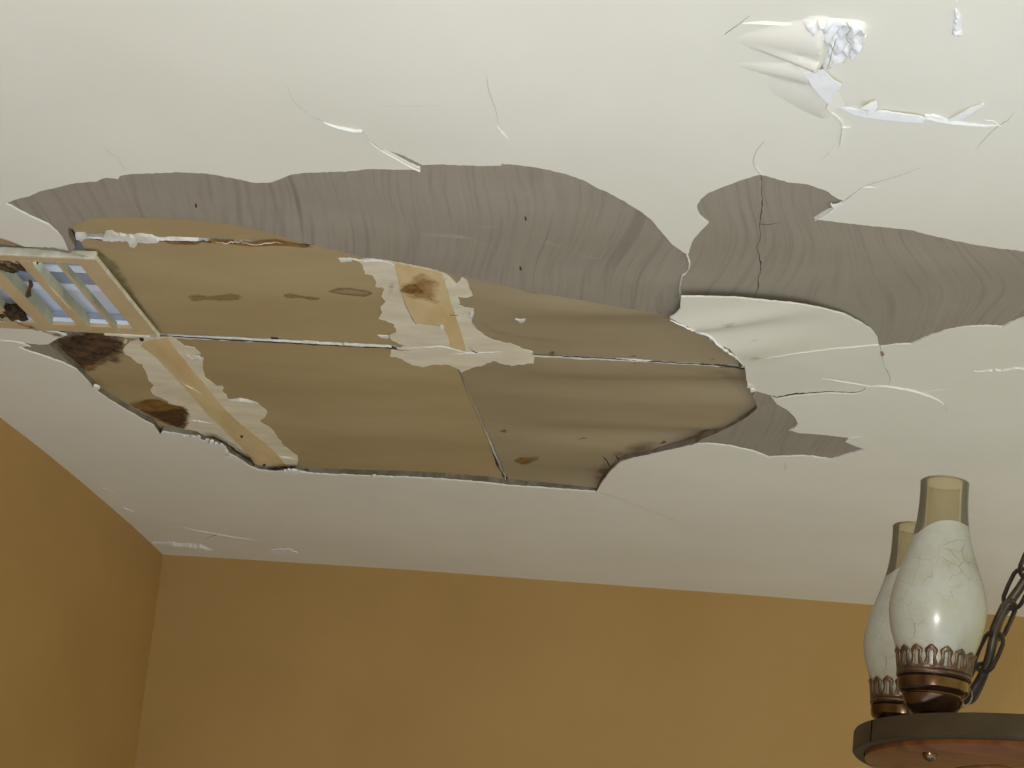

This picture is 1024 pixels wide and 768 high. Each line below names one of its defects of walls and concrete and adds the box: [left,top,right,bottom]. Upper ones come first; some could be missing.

crack [288,88,420,172]
spalling [802,18,1002,159]
peeling [8,152,1024,345]
crack [753,142,780,296]
water stain [29,326,122,369]
peeling [23,341,863,491]
crack [765,344,947,413]
crack [976,365,1024,373]